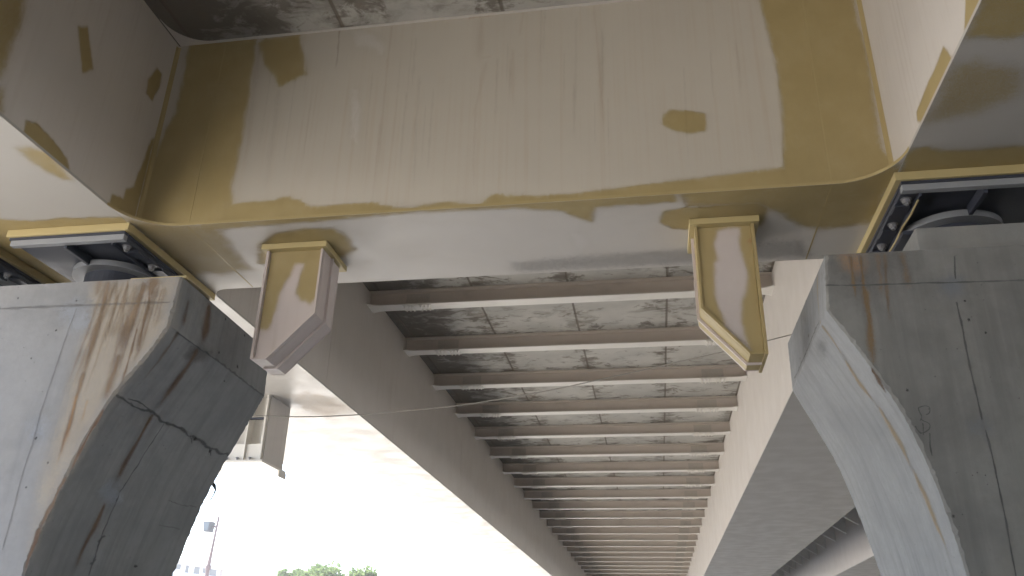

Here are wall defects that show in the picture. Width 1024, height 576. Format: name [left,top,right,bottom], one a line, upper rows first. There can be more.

rust [24,278,164,572]
crack [89,394,229,575]
rust [116,303,211,482]
rust [849,255,886,391]